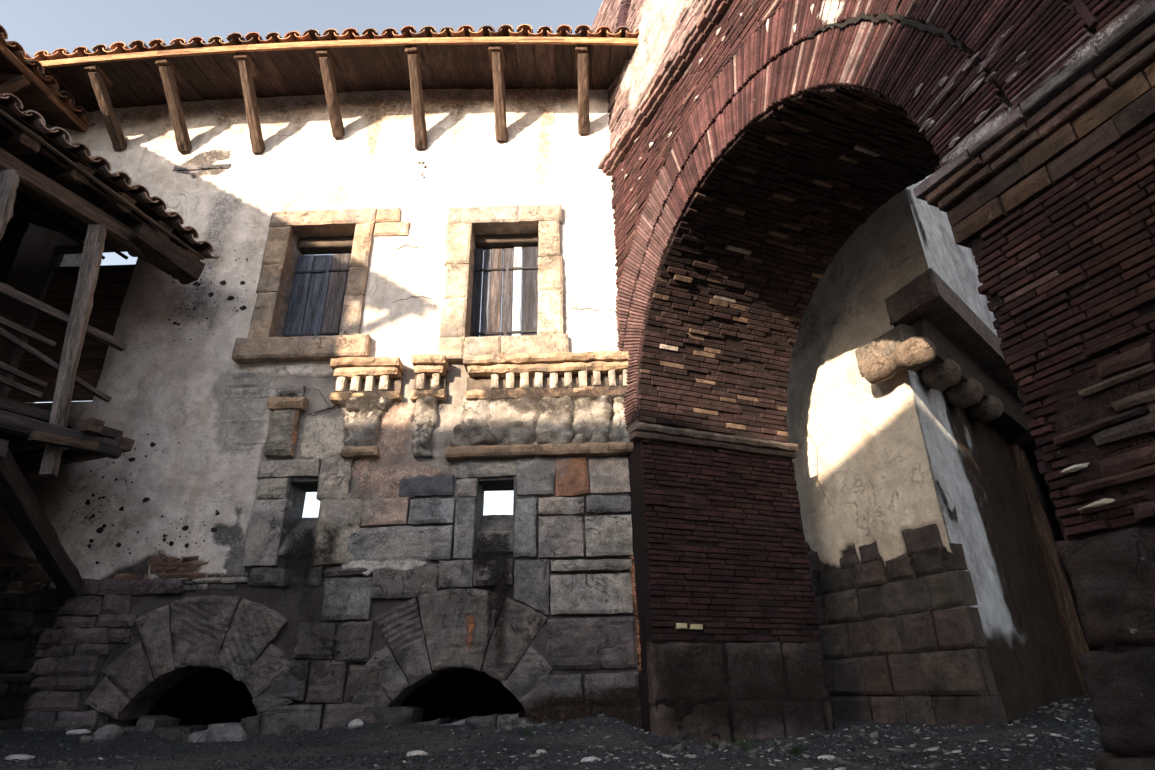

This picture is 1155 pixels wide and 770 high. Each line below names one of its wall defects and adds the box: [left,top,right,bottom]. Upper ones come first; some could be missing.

spalling [173,150,232,179]
spalling [70,434,164,549]
spalling [95,507,249,594]
water stain [283,526,339,682]
water stain [473,532,510,665]